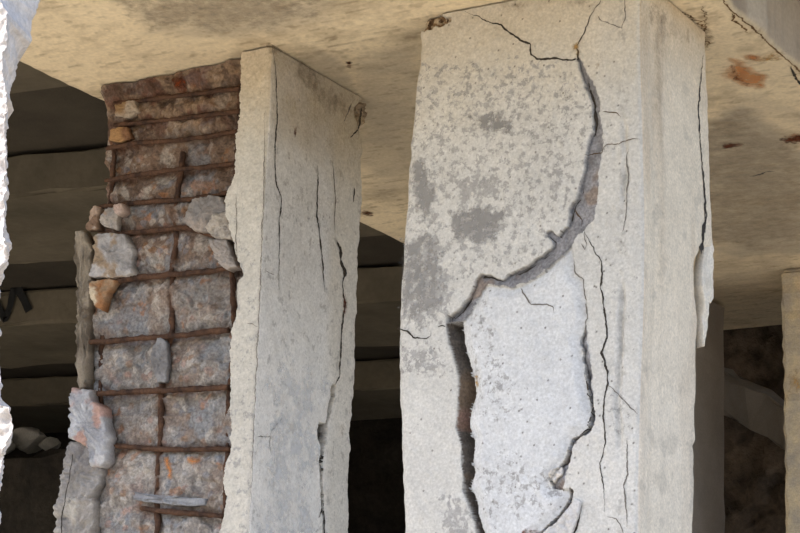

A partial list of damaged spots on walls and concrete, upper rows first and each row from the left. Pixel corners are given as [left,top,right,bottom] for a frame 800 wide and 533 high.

spalling [53,59,243,533]
crack [316,168,355,533]
crack [398,0,636,533]
crack [682,8,711,254]
rust [733,55,776,86]
crack [723,0,800,84]